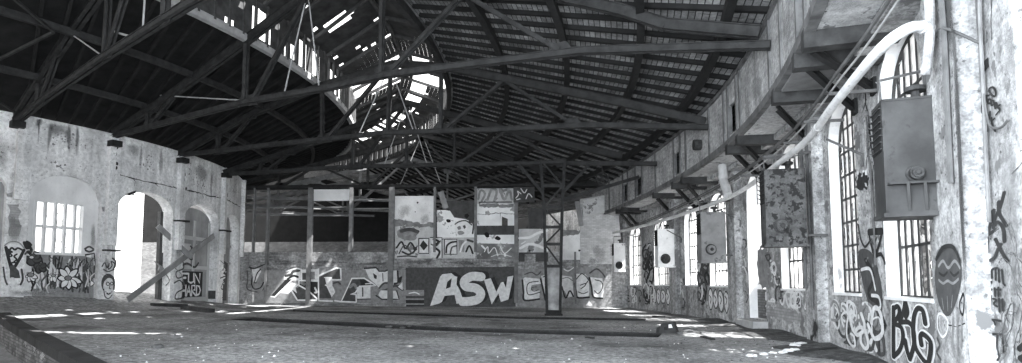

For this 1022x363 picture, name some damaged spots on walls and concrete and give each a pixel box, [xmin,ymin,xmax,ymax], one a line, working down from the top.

crack [120,174,240,207]